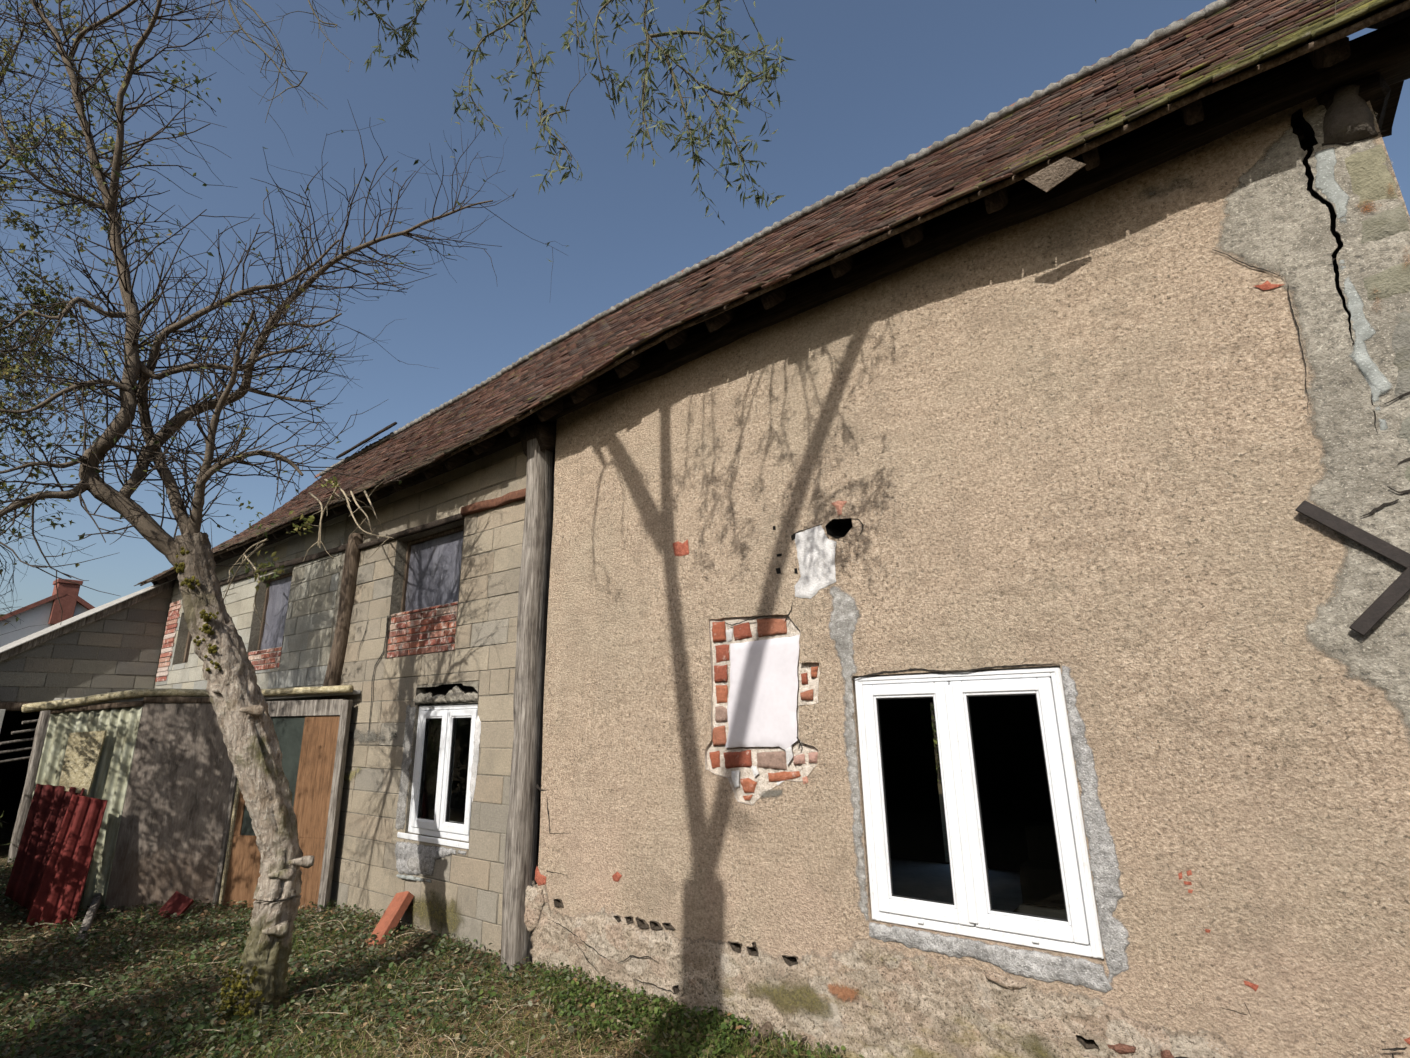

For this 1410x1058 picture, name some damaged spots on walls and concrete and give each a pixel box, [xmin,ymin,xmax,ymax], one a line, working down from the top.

spalling [1254,280,1284,290]
crack [1291,109,1387,345]
crack [1371,391,1410,434]
flaking render [705,500,863,805]
flaking render [524,867,1256,1058]